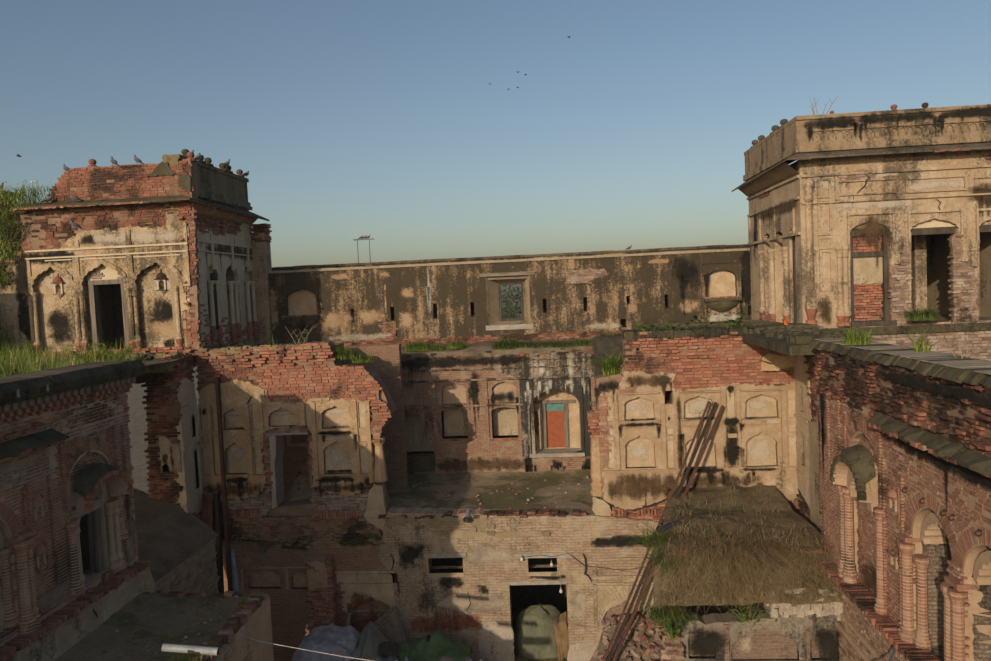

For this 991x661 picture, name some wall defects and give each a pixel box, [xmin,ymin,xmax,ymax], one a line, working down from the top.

damp [804,107,991,141]
damp [672,199,796,322]
damp [15,251,75,353]
damp [151,300,173,322]
flaking render [17,200,383,404]
damp [330,333,393,341]
peeling [324,272,413,341]